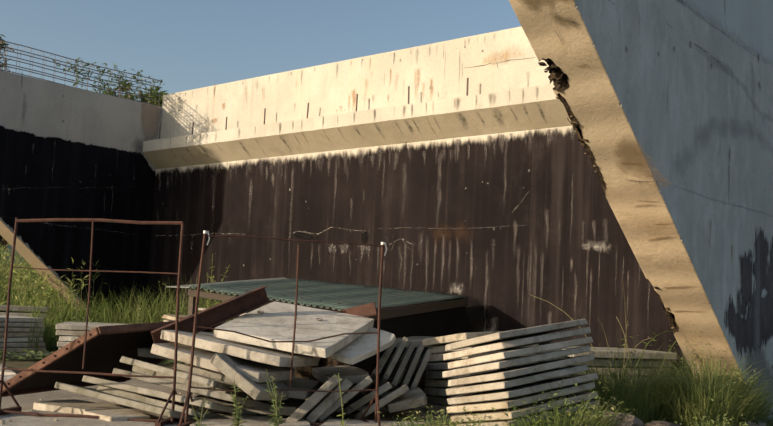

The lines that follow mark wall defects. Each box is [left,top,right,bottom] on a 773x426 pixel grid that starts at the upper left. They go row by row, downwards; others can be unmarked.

spalling [538,58,592,154]
water stain [450,286,493,332]